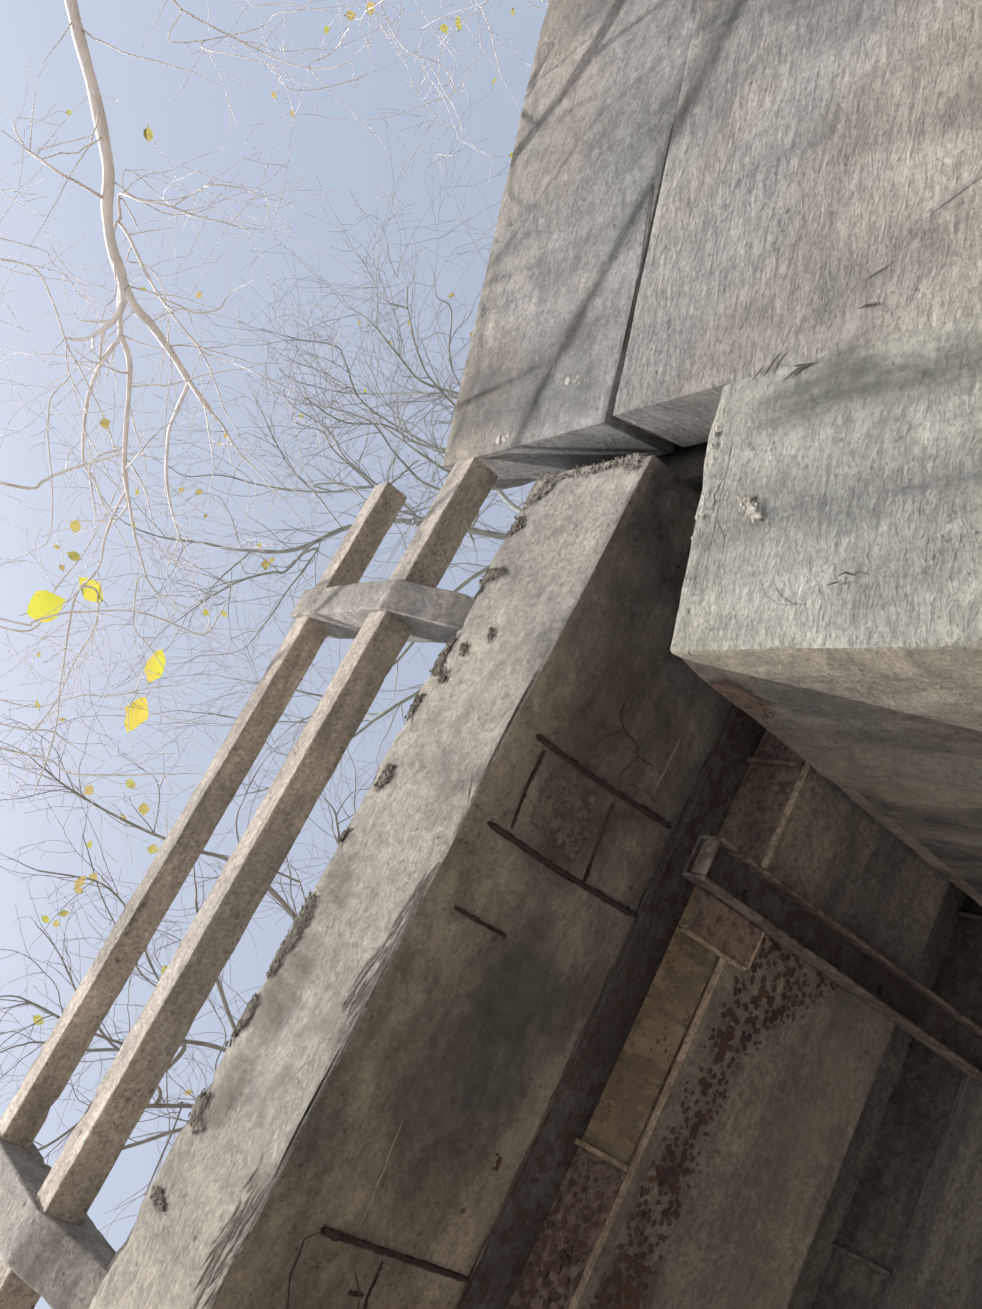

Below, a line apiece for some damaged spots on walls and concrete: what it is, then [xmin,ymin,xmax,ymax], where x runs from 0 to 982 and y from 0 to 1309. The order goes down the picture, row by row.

spalling [479,566,506,585]
spalling [429,633,468,684]
spalling [404,692,423,721]
spalling [374,764,394,789]
peeling [188,859,441,1309]
rust [590,932,844,1309]
spalling [321,1227,469,1309]
rust [508,1154,624,1309]